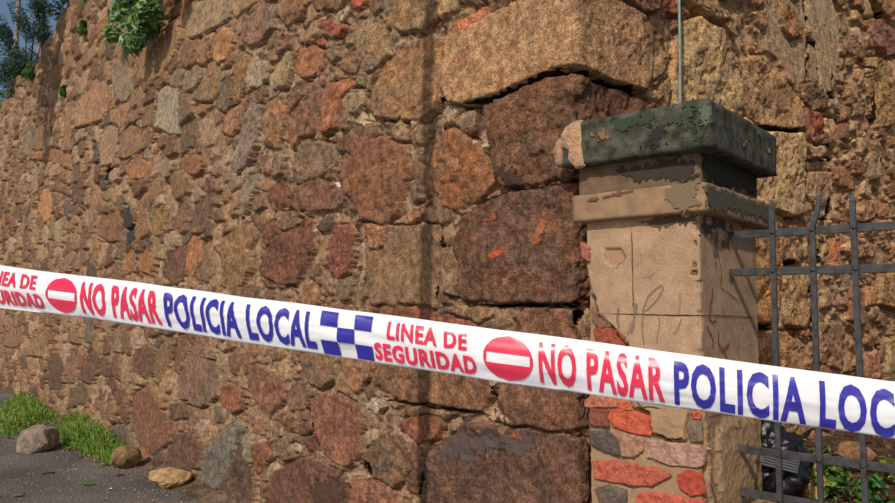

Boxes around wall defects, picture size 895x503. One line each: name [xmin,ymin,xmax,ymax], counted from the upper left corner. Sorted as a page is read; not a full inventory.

crack [802,0,833,89]
crack [440,67,634,133]
spalling [561,274,598,342]
spalling [591,401,714,503]